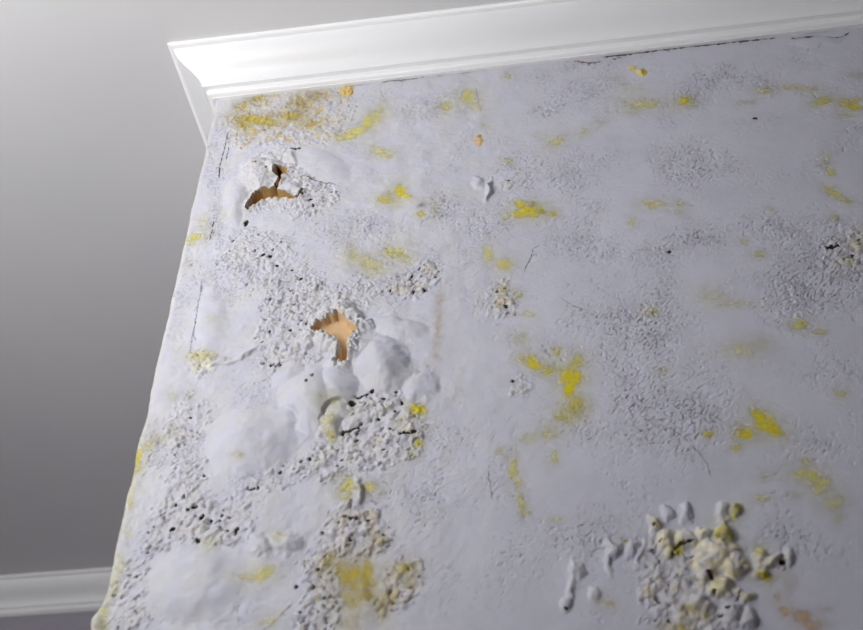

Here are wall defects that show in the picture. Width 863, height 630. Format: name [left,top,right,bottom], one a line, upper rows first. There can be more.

mould [236,98,314,128]
mould [337,112,379,140]
spalling [213,86,445,378]
mould [521,355,582,421]
mould [733,408,782,450]
mould [326,555,375,607]